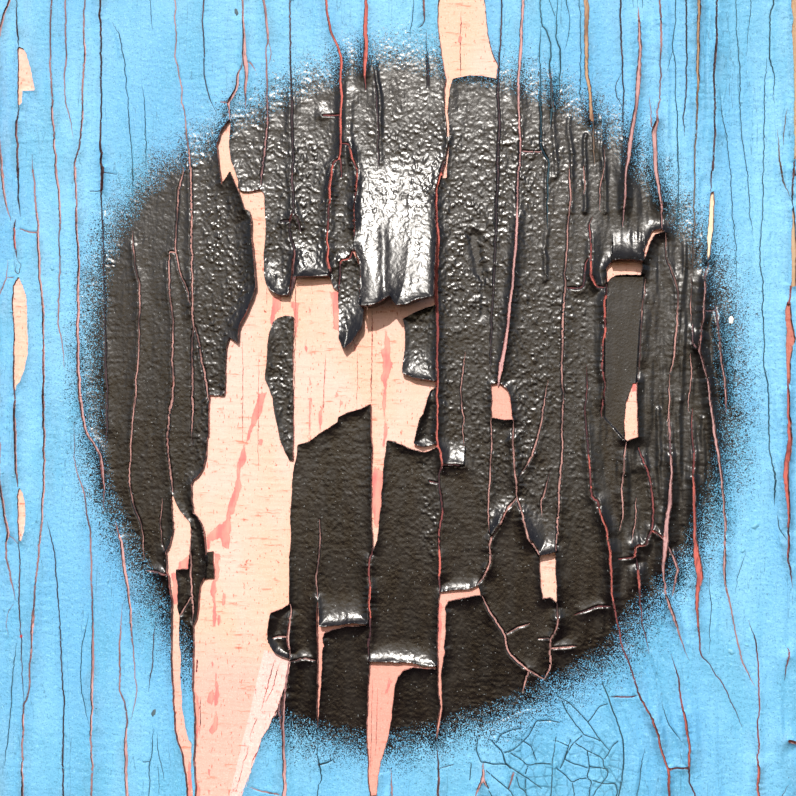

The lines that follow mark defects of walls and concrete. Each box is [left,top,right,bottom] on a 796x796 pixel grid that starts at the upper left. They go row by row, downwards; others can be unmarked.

peeling [17,48,34,105]
crack [202,0,301,296]
crack [323,0,358,291]
crack [363,0,379,166]
crack [410,0,429,88]
peeling [13,278,28,389]
crack [0,0,209,796]
peeling [167,0,497,796]
crack [436,0,796,796]
peeling [624,383,638,440]
peeling [606,220,664,282]
peeling [785,303,796,384]